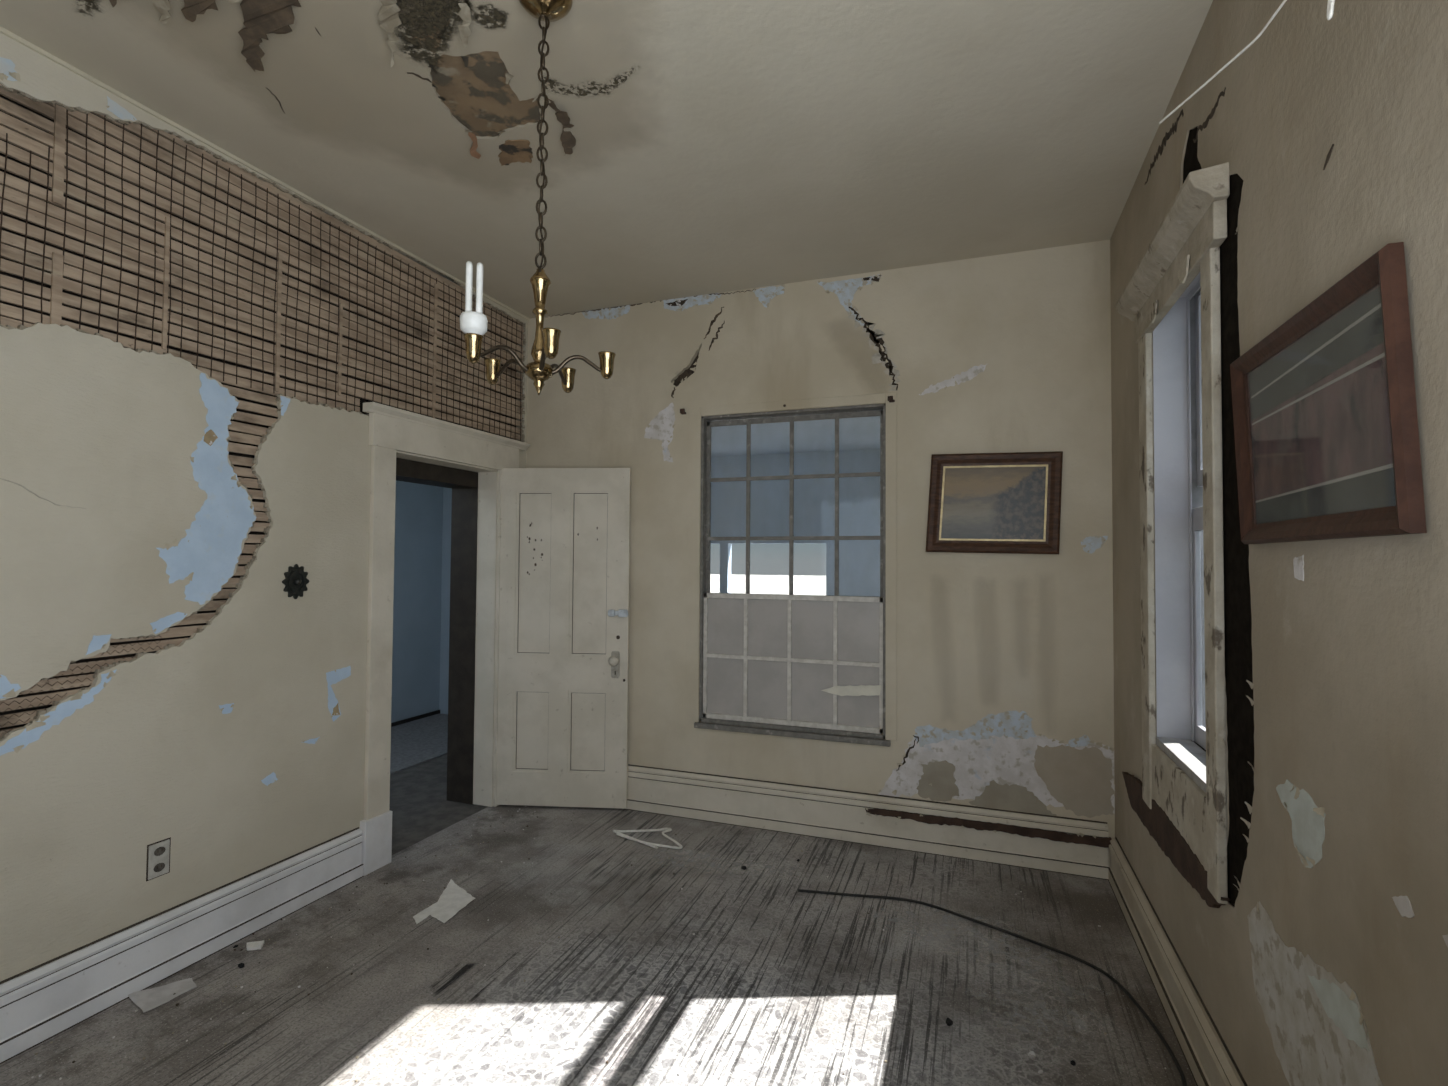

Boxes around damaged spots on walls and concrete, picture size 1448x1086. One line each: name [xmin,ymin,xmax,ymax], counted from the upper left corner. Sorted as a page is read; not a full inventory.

peeling [181,0,301,71]
spalling [378,0,541,166]
spalling [0,57,526,756]
crack [550,289,756,398]
crack [846,307,900,391]
peeling [865,710,1115,848]